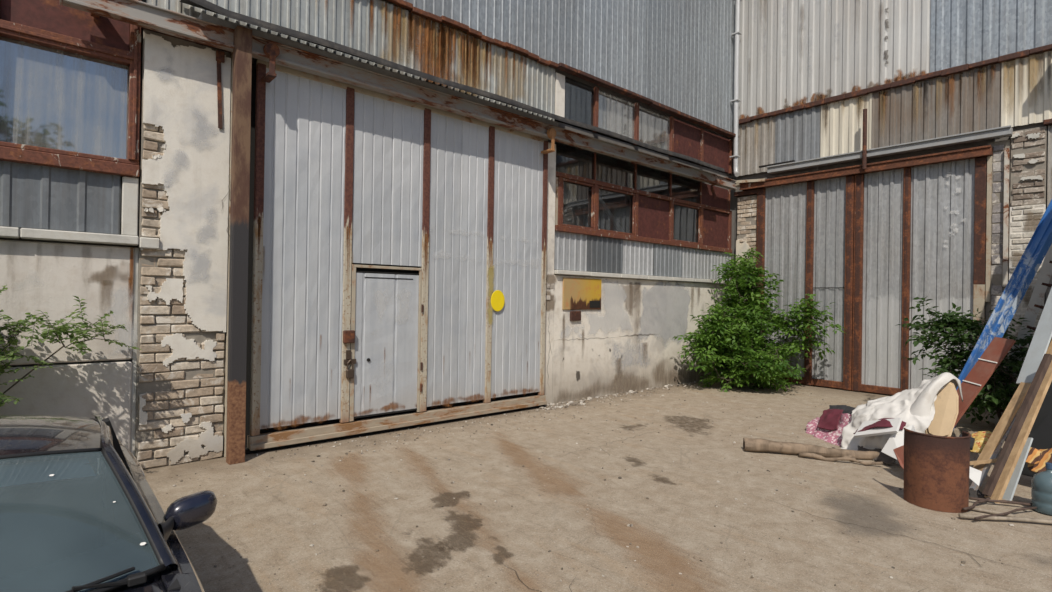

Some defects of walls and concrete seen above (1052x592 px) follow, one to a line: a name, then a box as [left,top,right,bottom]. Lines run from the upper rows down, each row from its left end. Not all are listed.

corrosion [370,0,491,96]
corrosion [784,70,932,110]
corrosion [975,51,1051,92]
flaking render [143,124,166,159]
flaking render [137,181,225,469]